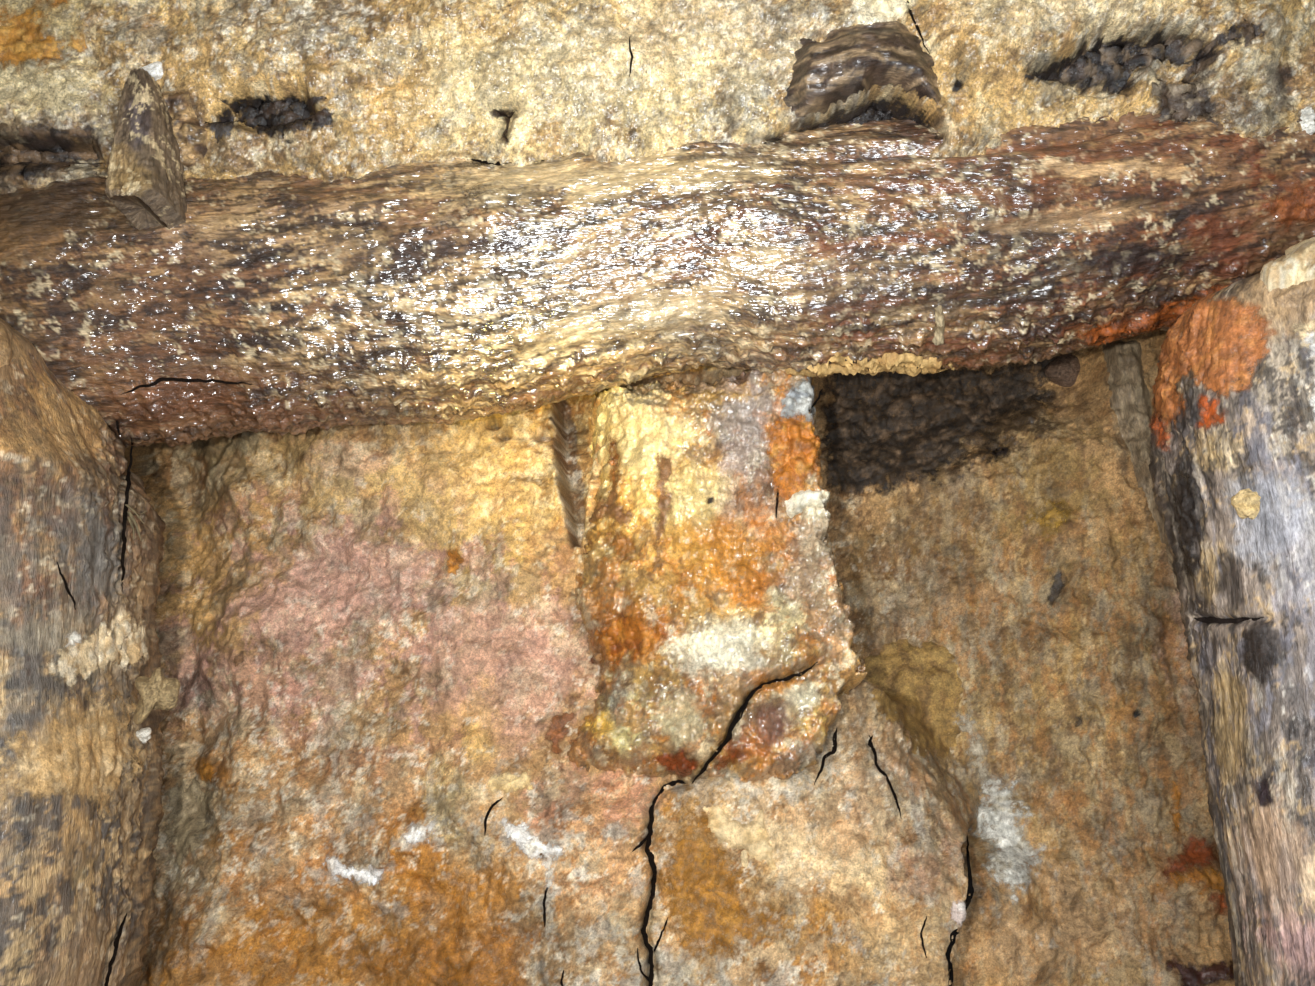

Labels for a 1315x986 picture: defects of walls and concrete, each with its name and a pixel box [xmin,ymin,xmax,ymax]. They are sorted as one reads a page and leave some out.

corrosion [1077,284,1276,448]
damp [1295,321,1315,419]
corrosion [767,414,830,518]
corrosion [590,612,667,673]
corrosion [657,749,697,778]
corrosion [714,746,741,770]
crack [814,728,837,785]
crack [868,735,902,819]
crack [632,661,818,986]
crack [541,887,549,927]
crack [920,834,974,986]